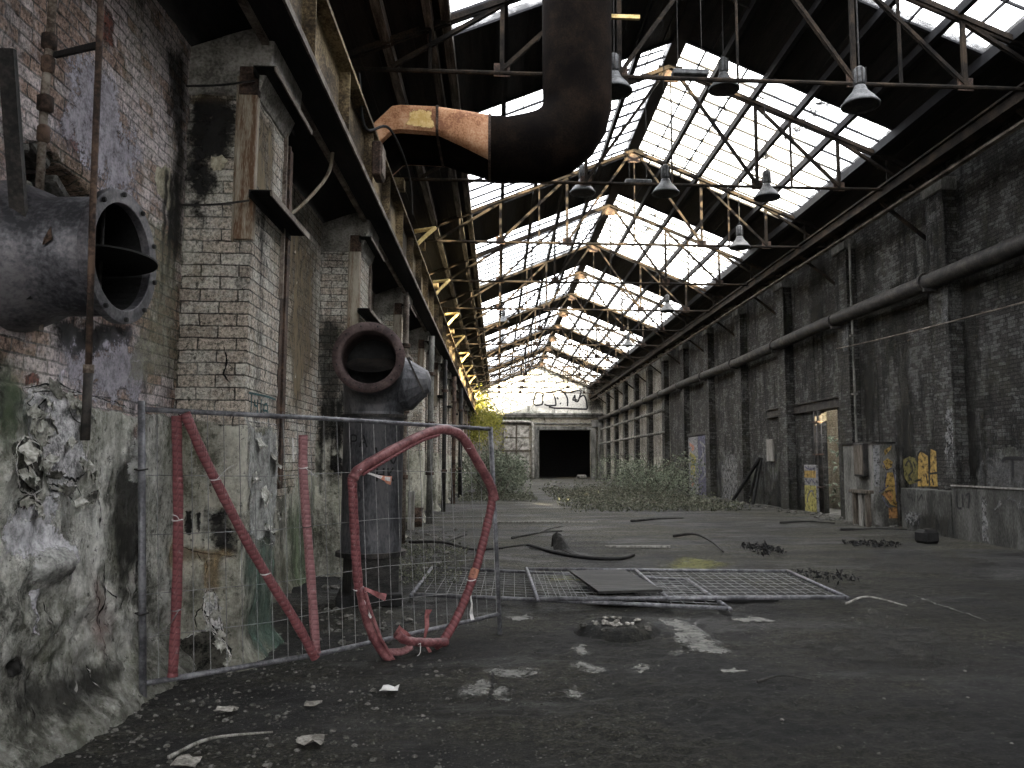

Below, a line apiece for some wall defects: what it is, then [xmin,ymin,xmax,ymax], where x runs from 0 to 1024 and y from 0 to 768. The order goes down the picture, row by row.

water stain [161,51,212,289]
crack [223,346,233,384]
flaking render [12,373,102,522]
water stain [114,450,138,595]
flaking render [180,588,231,674]